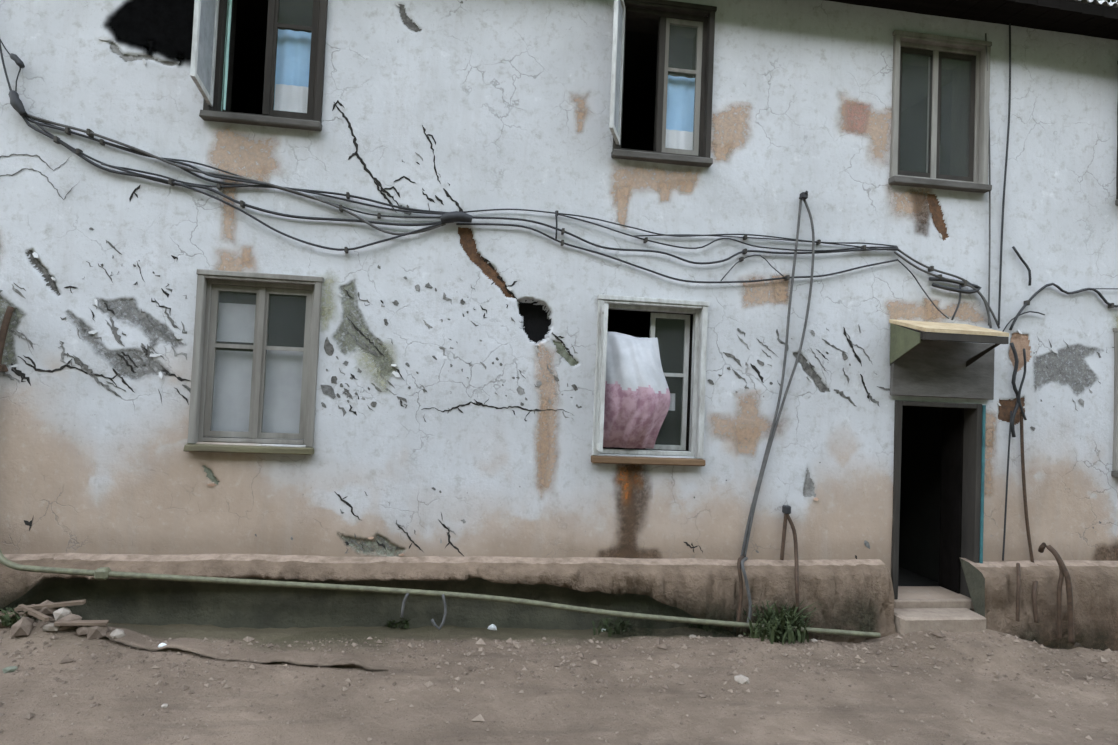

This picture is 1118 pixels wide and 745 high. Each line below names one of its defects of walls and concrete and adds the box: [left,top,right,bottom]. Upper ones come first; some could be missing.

crack [0,154,77,200]
crack [332,100,463,213]
rust [894,191,929,235]
spalling [25,250,60,296]
spalling [58,271,191,405]
spalling [321,282,427,417]
spalling [404,276,489,329]
crack [421,399,569,418]
spalling [457,222,582,421]
spalling [997,397,1035,431]
spalling [1009,330,1114,411]
water stain [599,464,661,559]